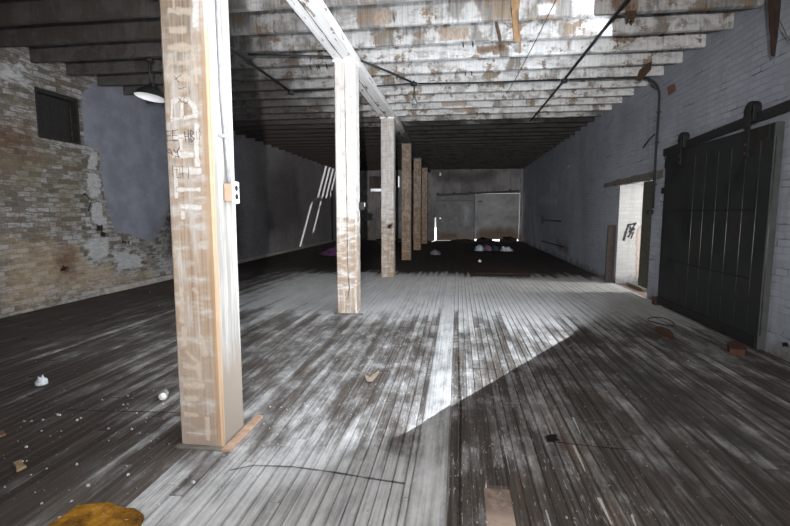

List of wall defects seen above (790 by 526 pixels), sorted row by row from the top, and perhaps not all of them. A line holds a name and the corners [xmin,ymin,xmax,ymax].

peeling [369,5,394,26]
peeling [435,23,473,41]
peeling [533,0,561,16]
peeling [0,47,44,102]
peeling [439,101,473,113]
peeling [74,75,171,277]
peeling [233,131,244,198]
damp [0,128,161,318]